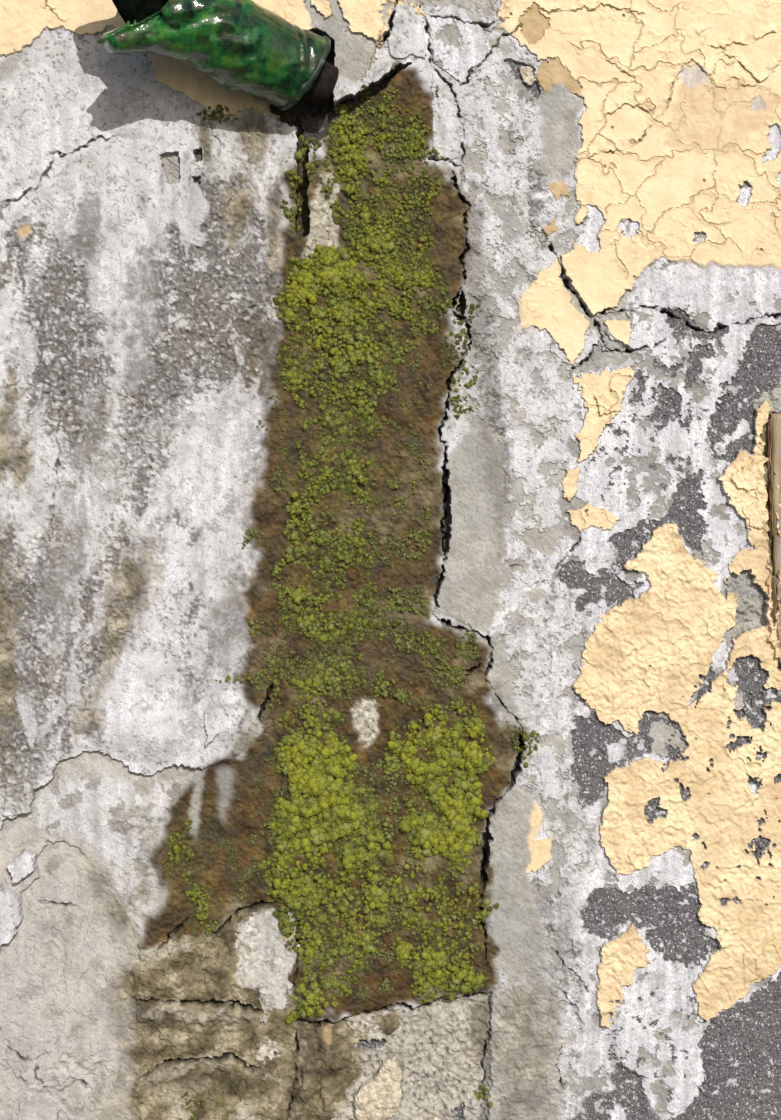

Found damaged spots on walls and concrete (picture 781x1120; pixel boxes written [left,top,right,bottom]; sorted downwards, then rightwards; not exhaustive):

crack [0,134,116,211]
spalling [160,153,201,185]
peeling [270,0,498,237]
peeling [504,57,585,201]
peeling [576,205,640,253]
crack [582,30,781,162]
crack [547,235,781,380]
leakage [0,60,521,1023]
crack [132,0,644,1120]
peeling [557,257,781,1120]
spalling [0,751,495,1120]
crack [0,1027,98,1095]